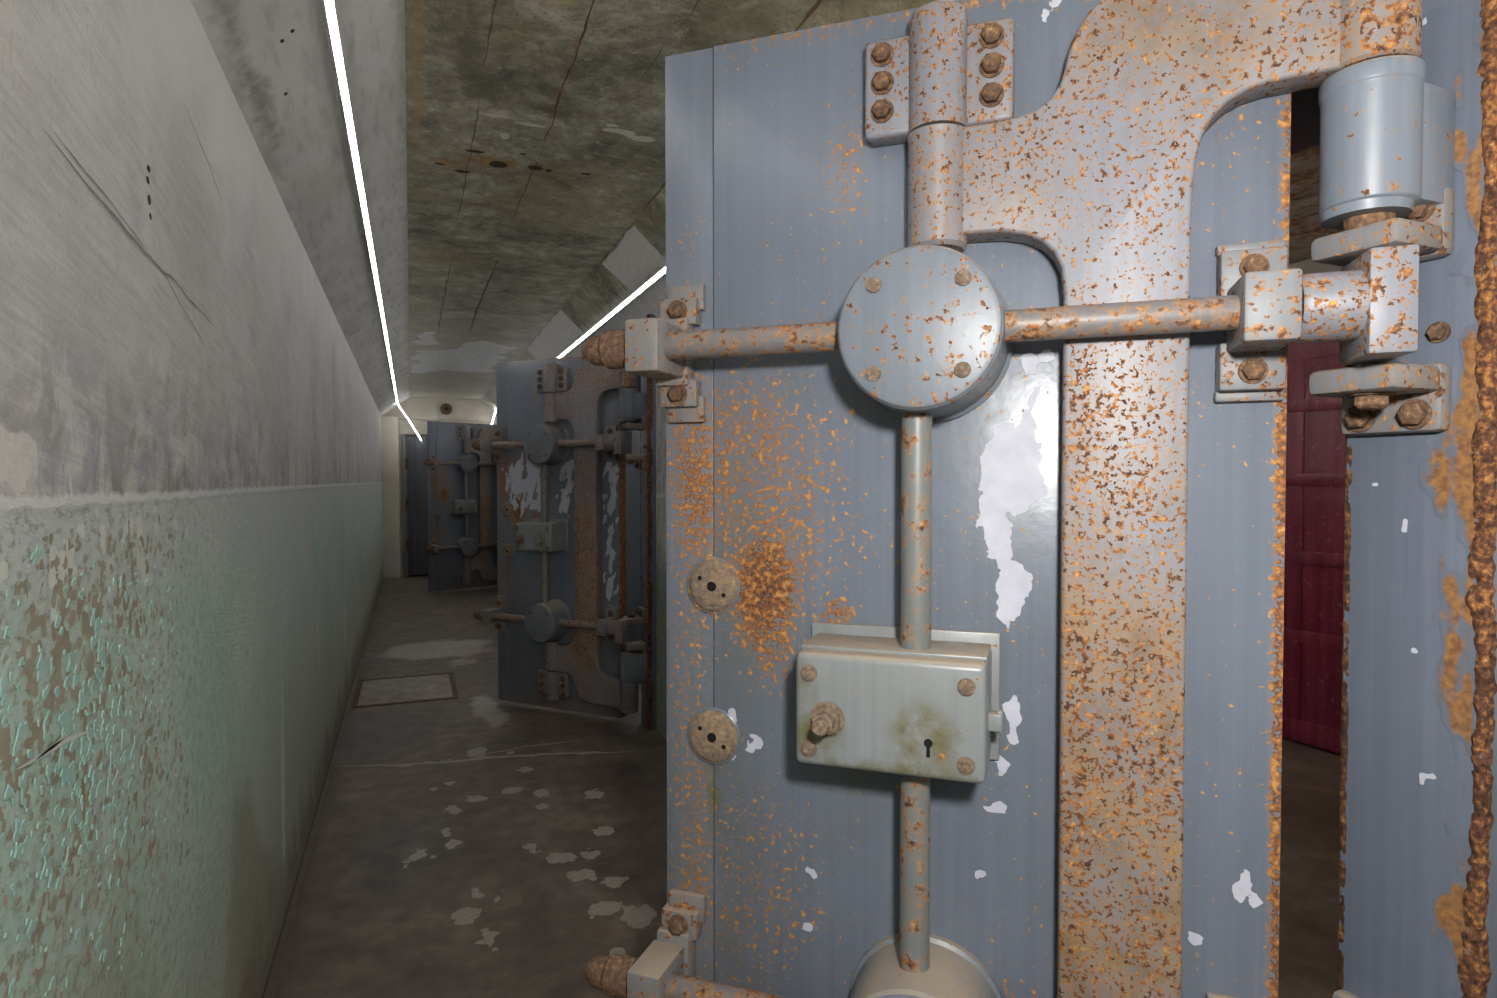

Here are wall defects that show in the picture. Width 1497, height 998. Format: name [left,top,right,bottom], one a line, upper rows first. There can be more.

crack [43,126,217,347]
water stain [406,0,549,146]
crack [437,0,595,335]
water stain [601,123,657,143]
crack [640,182,666,213]
crack [795,0,823,31]
peeling [0,500,234,998]